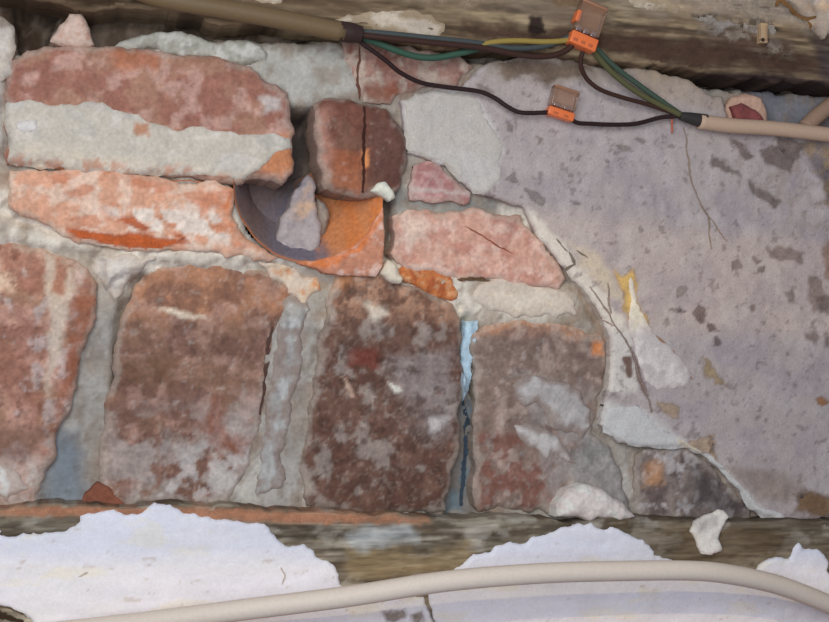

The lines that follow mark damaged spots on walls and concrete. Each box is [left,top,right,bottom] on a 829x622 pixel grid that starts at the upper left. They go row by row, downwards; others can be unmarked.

crack [356,45,366,193]
spalling [526,190,544,205]
crack [683,127,727,249]
crack [556,239,588,281]
crack [590,284,652,412]
peeling [689,509,729,555]
crack [0,606,26,622]